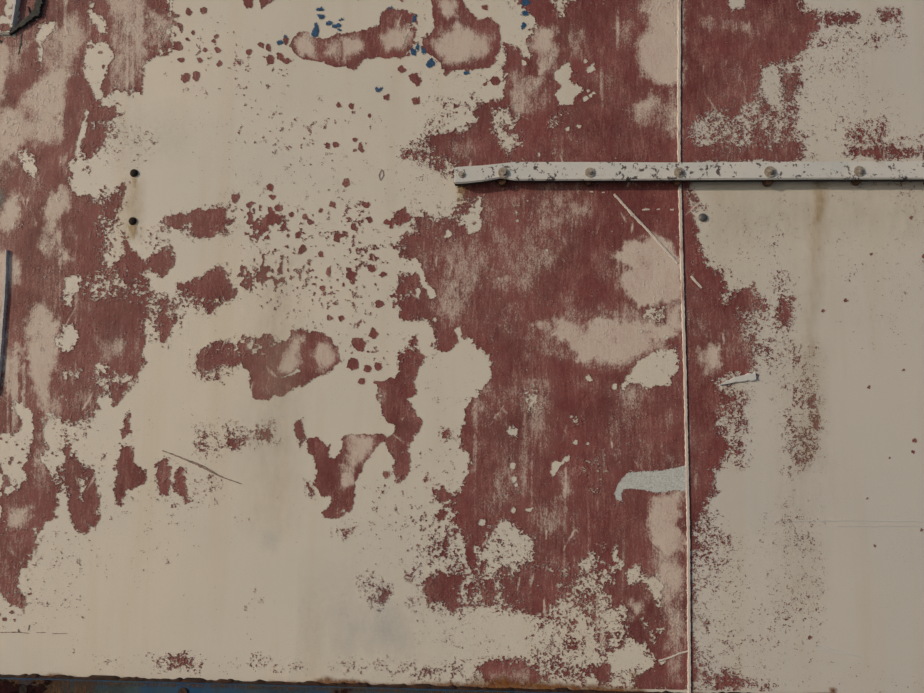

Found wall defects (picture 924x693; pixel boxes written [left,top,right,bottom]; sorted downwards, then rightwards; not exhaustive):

peeling [243,0,273,9]
peeling [216,44,258,72]
peeling [228,95,382,172]
peeling [823,92,924,161]
peeling [186,309,388,401]
peeling [183,408,283,459]
peeling [356,555,393,617]
peeling [146,650,238,674]
rust [0,673,680,693]